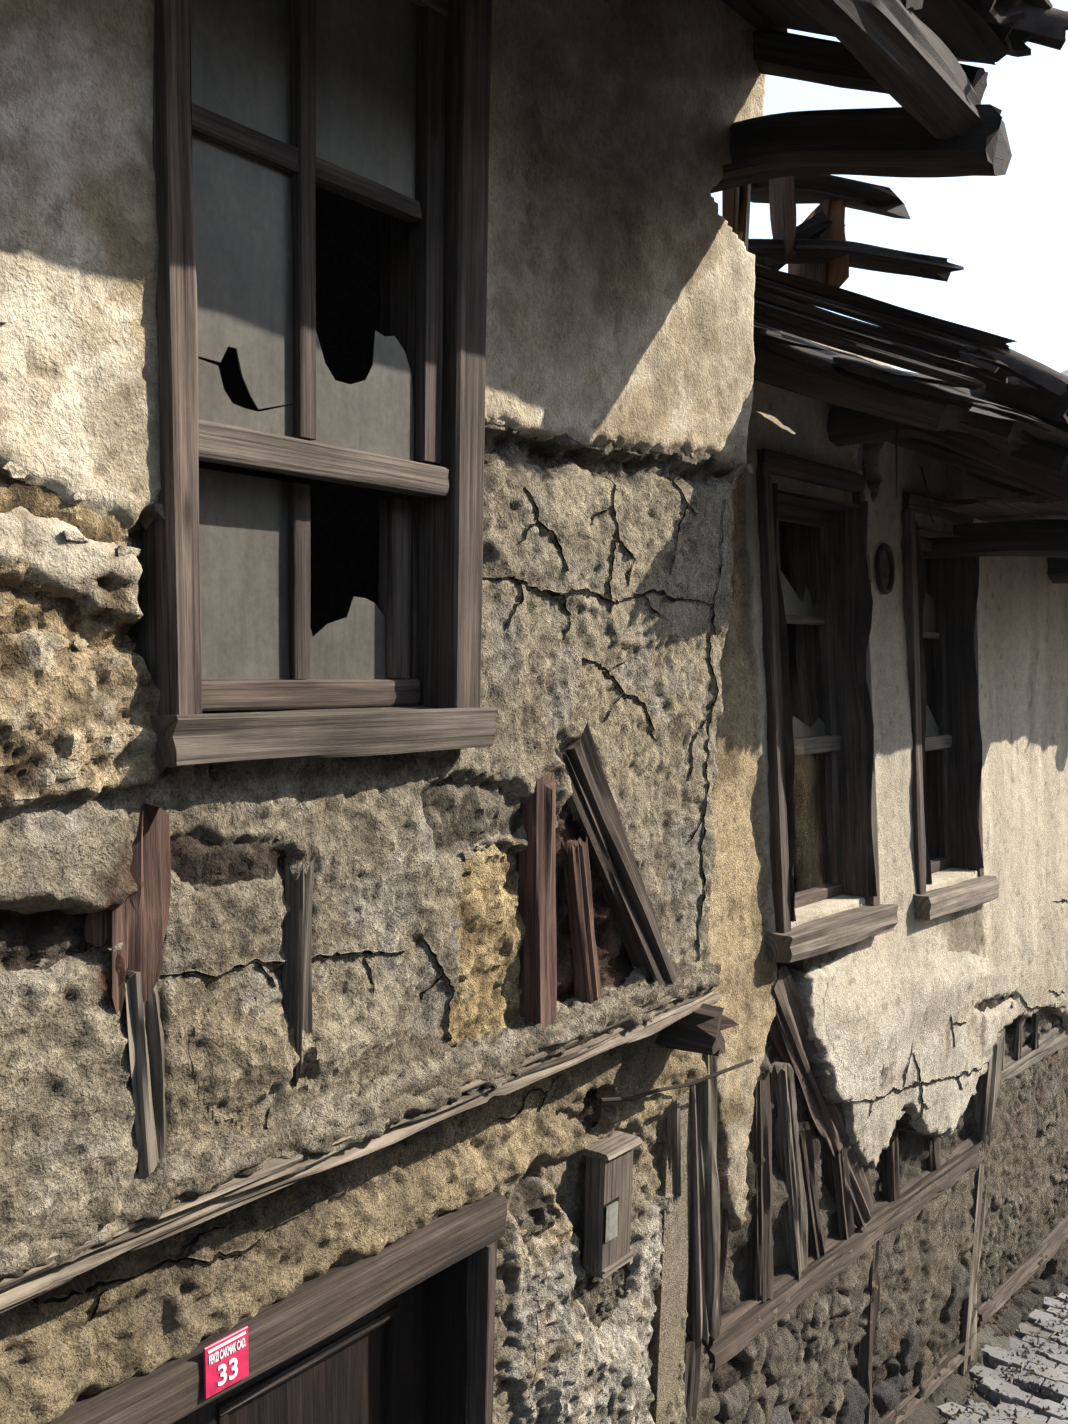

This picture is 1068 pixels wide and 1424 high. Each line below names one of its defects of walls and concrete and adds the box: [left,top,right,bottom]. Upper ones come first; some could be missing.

spalling [0,461,146,658]
crack [483,476,726,961]
spalling [892,1106,917,1135]
crack [847,1014,990,1121]
spalling [996,994,1063,1059]
crack [1018,990,1068,1017]
crack [31,1210,307,1322]